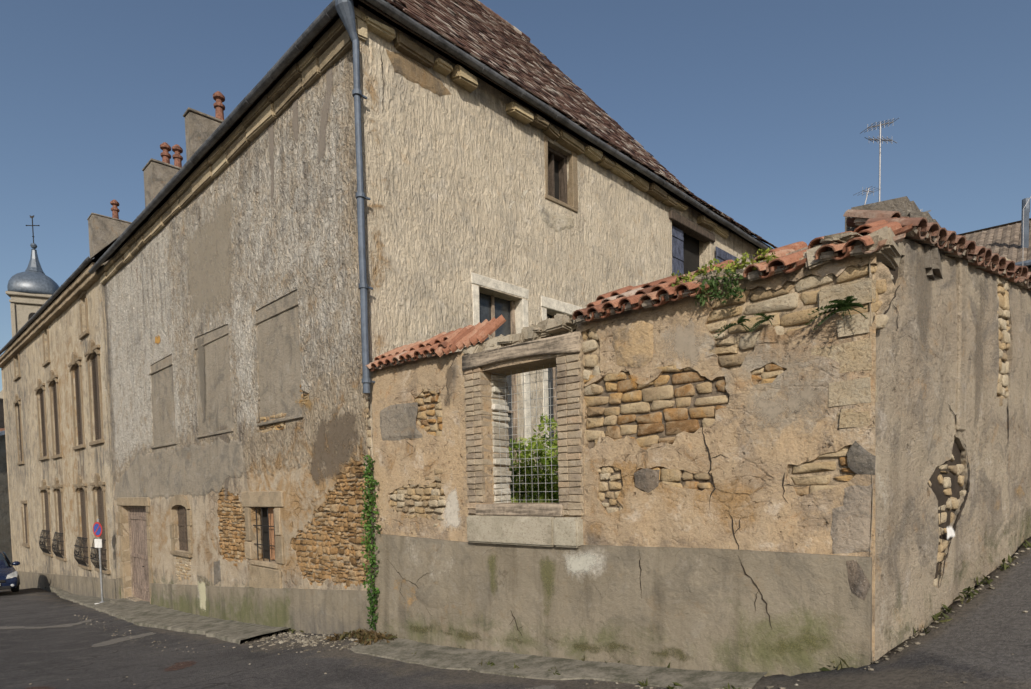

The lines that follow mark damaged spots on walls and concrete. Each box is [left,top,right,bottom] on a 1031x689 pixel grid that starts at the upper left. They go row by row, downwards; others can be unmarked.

flaking render [582,262,898,450]
flaking render [217,488,246,567]
flaking render [291,394,375,589]
water stain [311,413,357,485]
flaking render [389,469,446,527]
flaking render [415,389,443,437]
water stain [567,554,596,572]
flaking render [598,466,715,513]
crack [702,423,772,628]
flaking render [787,445,856,496]
flaking render [928,454,966,587]